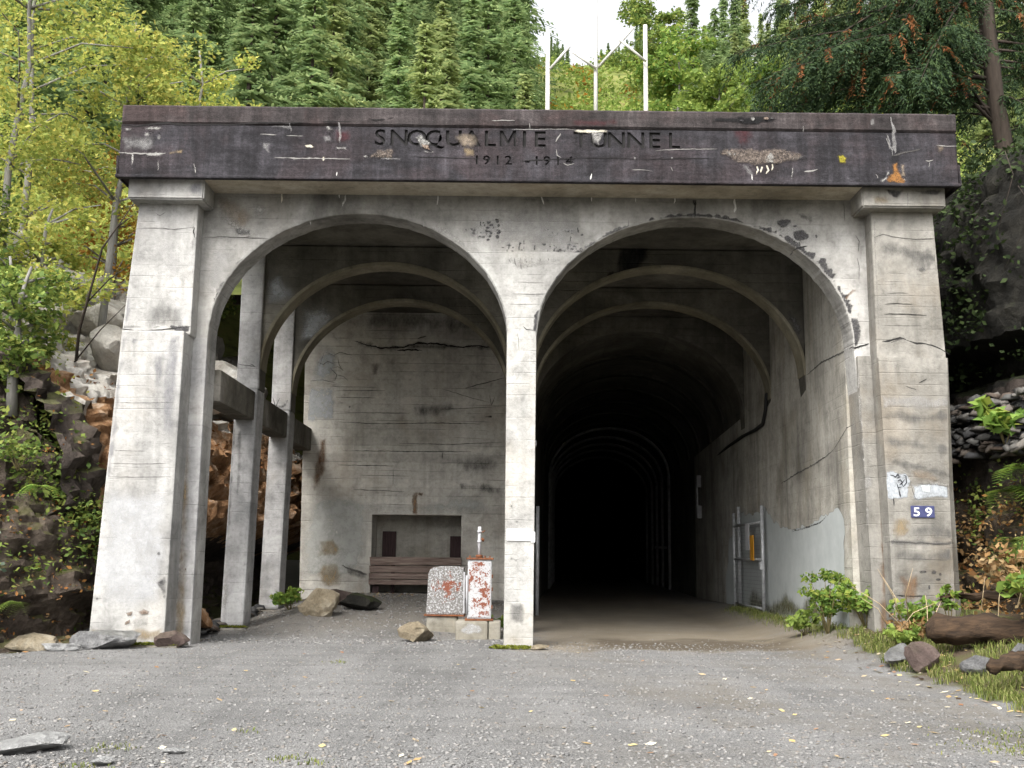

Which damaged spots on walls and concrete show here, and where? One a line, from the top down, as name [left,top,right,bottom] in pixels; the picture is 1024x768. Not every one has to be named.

spalling [722,149,800,174]
spalling [433,219,626,267]
peeling [649,214,860,345]
crack [807,281,950,375]
crack [312,336,503,492]
corrosion [315,440,325,483]
crack [782,424,854,483]